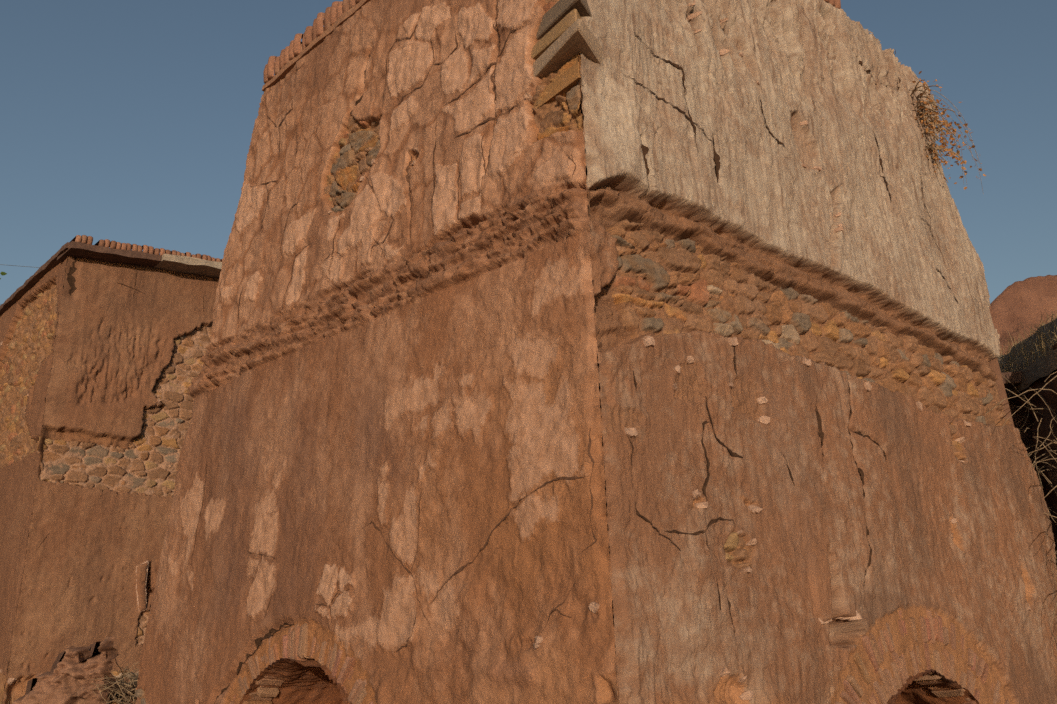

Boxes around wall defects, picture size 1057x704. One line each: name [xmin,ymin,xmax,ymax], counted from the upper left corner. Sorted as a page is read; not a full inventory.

crack [67,257,77,295]
crack [249,103,342,304]
crack [350,14,458,116]
crack [370,0,523,256]
spalling [0,284,229,596]
crack [369,428,597,652]
spalling [313,219,1012,659]
crack [816,382,886,497]
crack [864,525,872,583]
spalling [591,666,618,704]